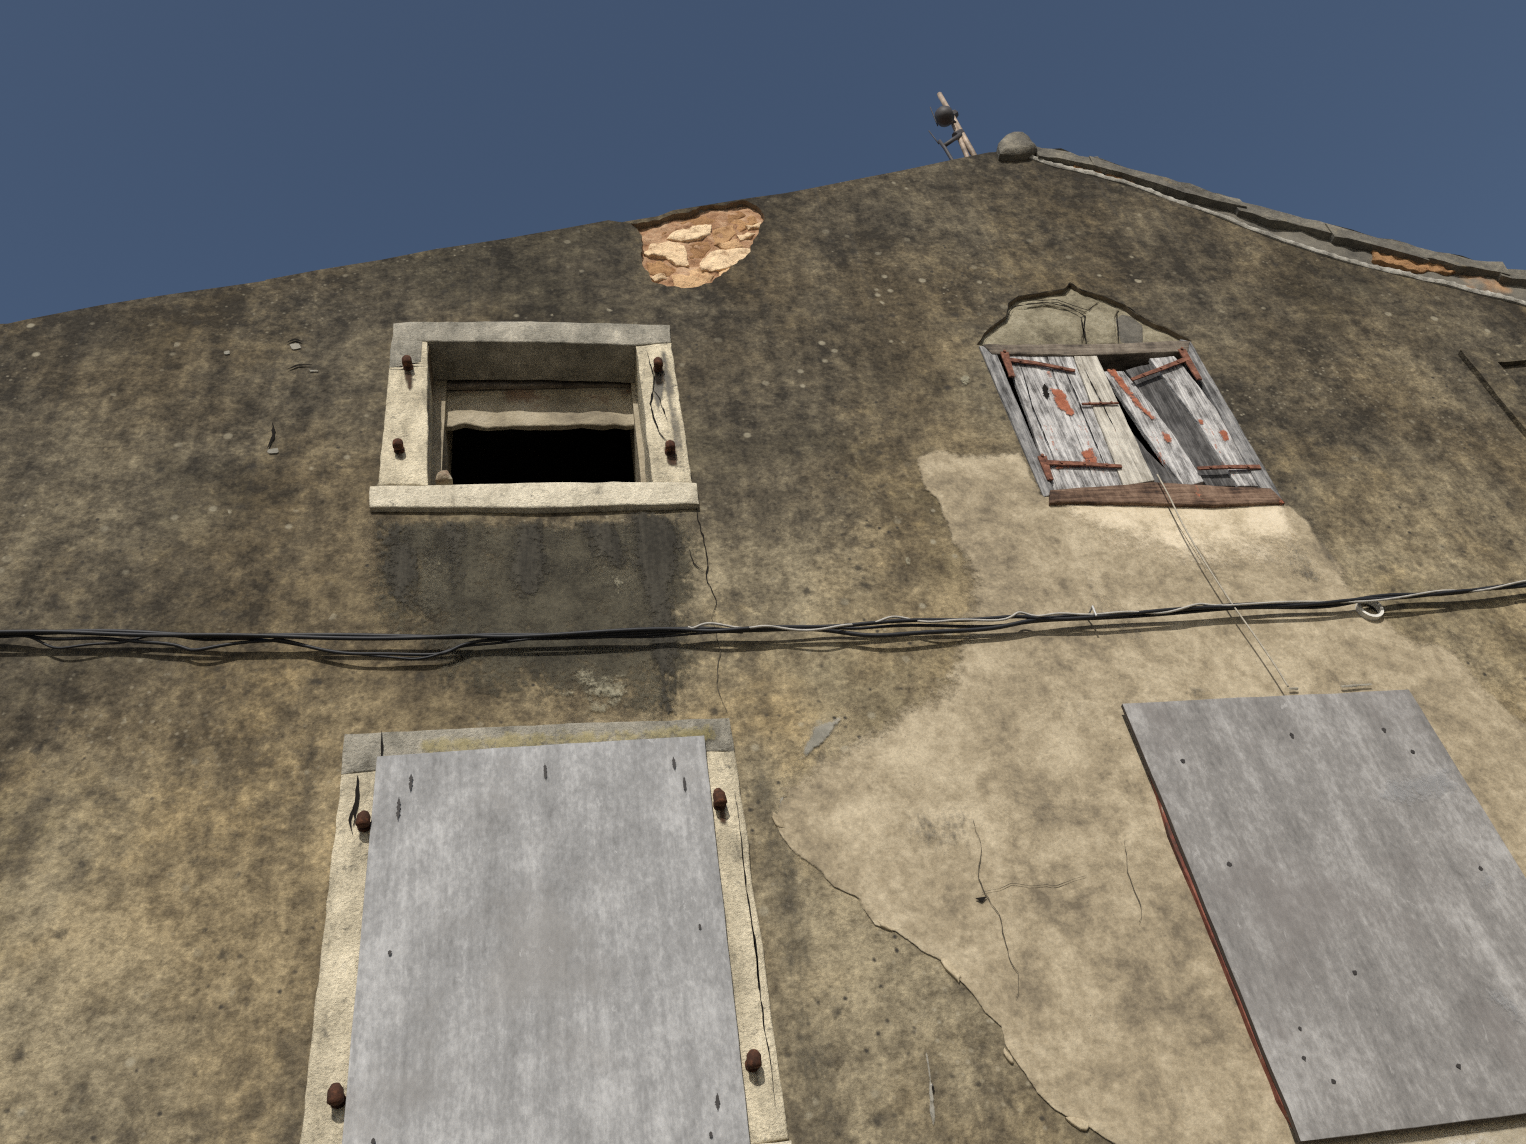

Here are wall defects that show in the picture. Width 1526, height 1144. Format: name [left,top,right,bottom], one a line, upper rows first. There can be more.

flaking render [638,207,763,288]
damp [373,512,701,720]
crack [973,820,1083,998]